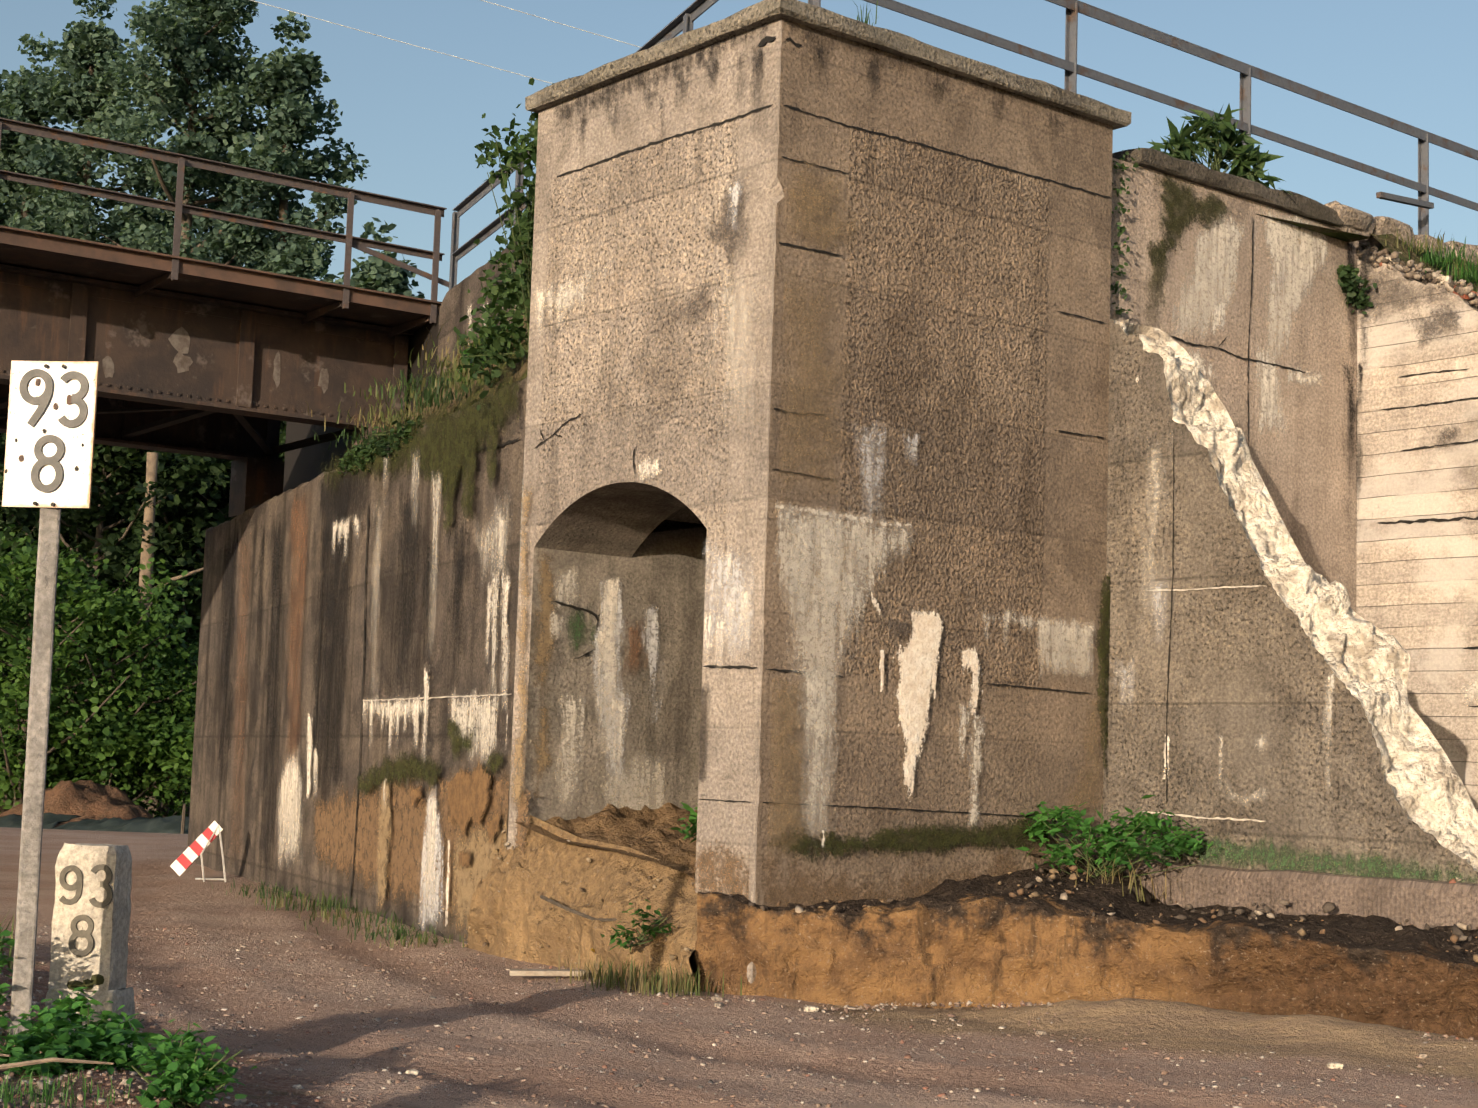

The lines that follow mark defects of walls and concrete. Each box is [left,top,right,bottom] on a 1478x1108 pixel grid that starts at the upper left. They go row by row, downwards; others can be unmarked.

water stain [556,23,767,133]
water stain [1144,240,1169,297]
crack [1381,369,1478,411]
crack [1402,439,1478,451]
water stain [363,410,500,735]
spalling [1114,213,1478,871]
crack [1378,516,1478,524]
water stain [257,468,368,863]
water stain [452,573,510,774]
water stain [561,579,630,799]
water stain [641,608,658,674]
efflorescence [420,797,450,926]